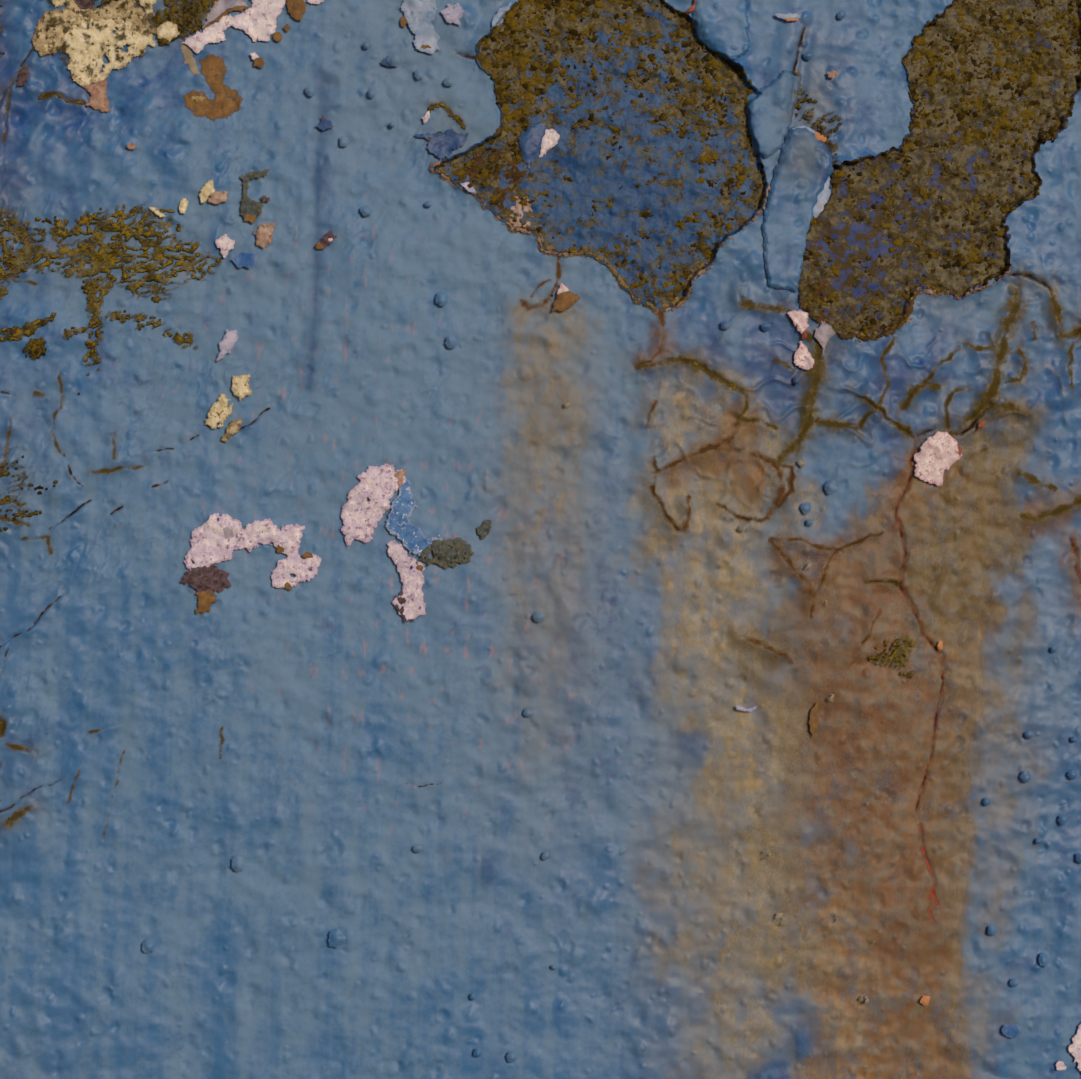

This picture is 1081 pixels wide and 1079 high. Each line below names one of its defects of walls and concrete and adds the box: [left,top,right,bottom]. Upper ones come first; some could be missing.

peeling [32,0,324,112]
peeling [428,0,1081,370]
peeling [394,469,407,488]
peeling [419,520,492,569]
crack [635,273,1081,923]
crack [0,719,29,751]
crack [218,727,226,759]
rust [728,401,1037,1079]
crack [0,770,80,827]
peeling [1056,1024,1081,1071]